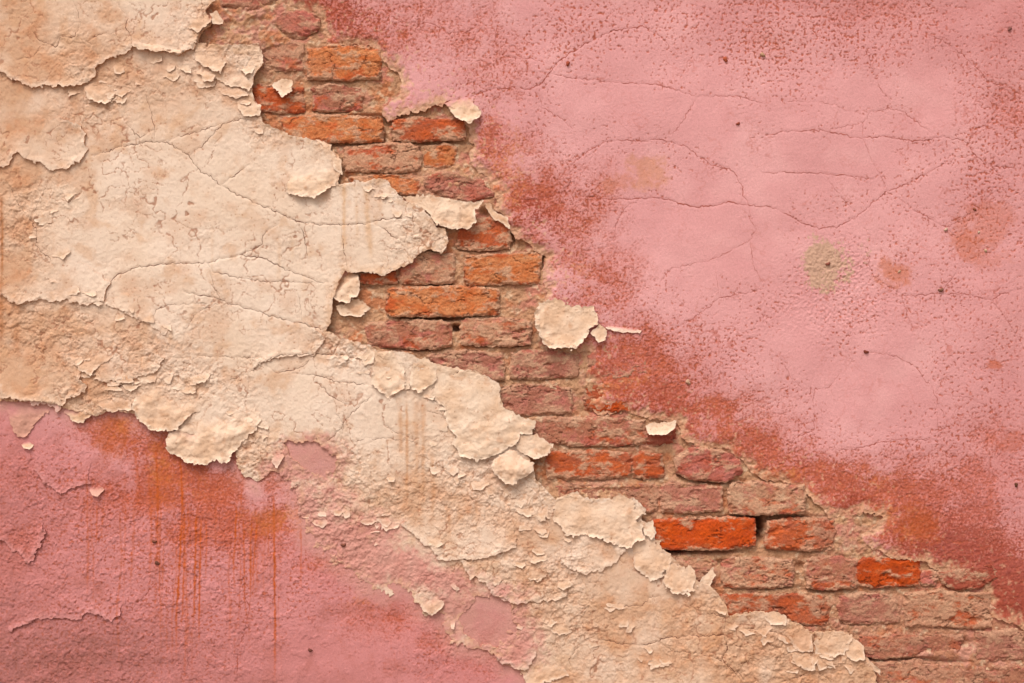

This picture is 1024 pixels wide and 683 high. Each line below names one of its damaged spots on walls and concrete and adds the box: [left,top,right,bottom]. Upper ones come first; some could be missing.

peeling [446,91,482,124]
peeling [285,149,343,199]
crack [378,7,1021,341]
crack [94,101,459,445]
peeling [534,298,641,349]
peeling [429,366,553,462]
crack [841,353,994,464]
peeling [491,449,535,486]
corrosion [83,409,305,683]
peeling [359,508,574,605]
peeling [552,491,656,575]
peeling [783,625,880,675]